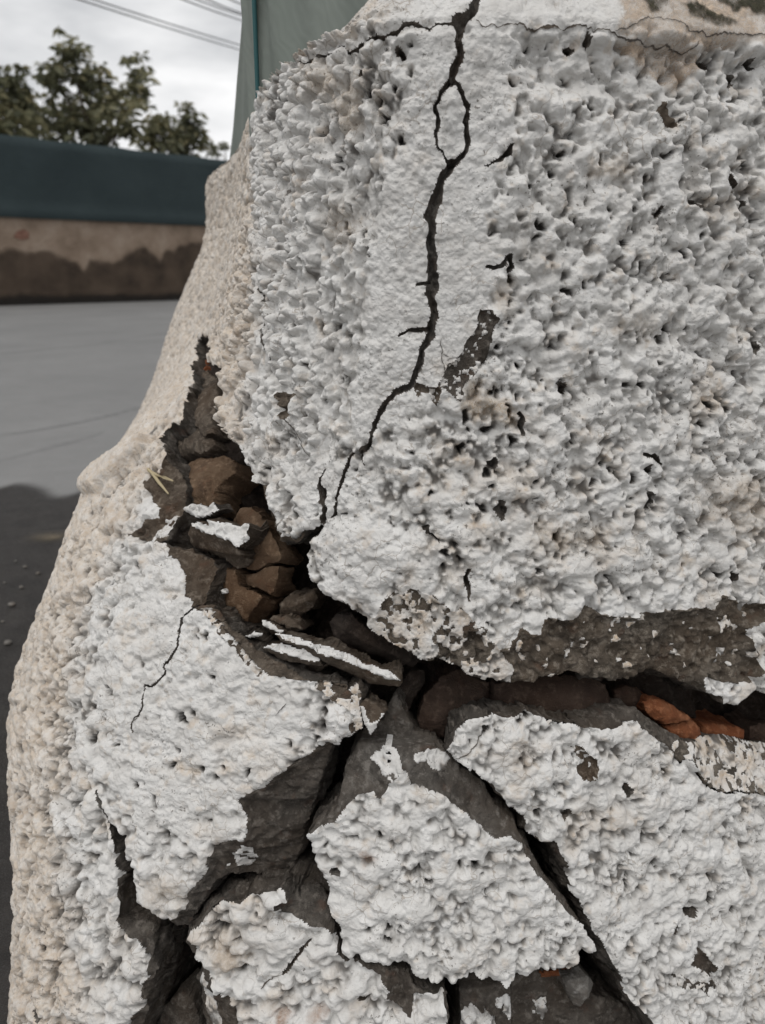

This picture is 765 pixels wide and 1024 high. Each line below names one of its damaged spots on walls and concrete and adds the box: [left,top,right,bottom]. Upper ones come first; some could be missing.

damp [0,243,202,306]
crack [284,0,765,525]
peeling [414,309,500,406]
crack [130,605,201,733]
spalling [107,335,765,1024]